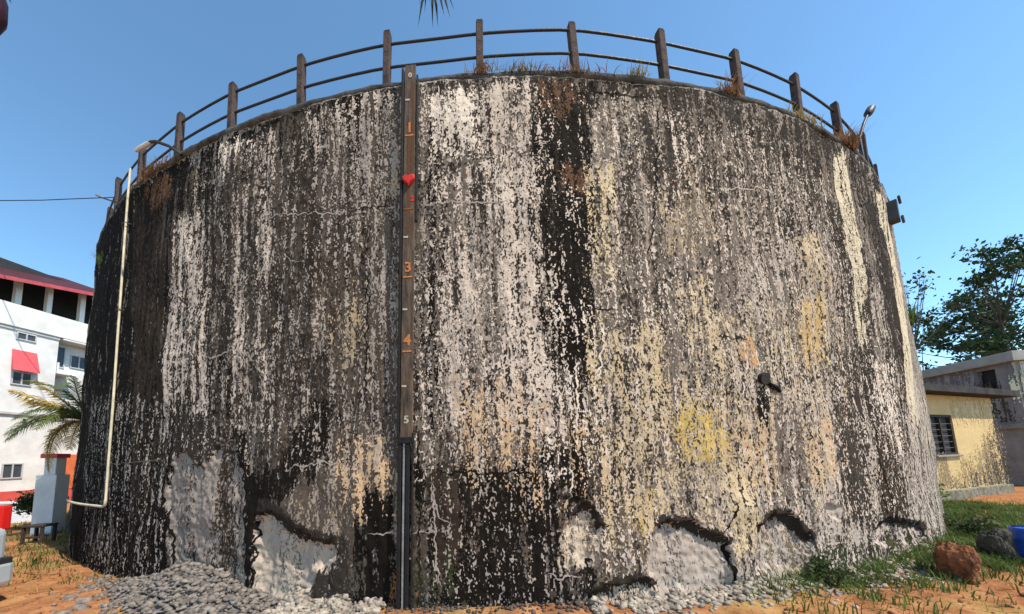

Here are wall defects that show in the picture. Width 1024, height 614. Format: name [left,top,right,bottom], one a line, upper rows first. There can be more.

leakage [69,76,946,609]
peeling [82,76,944,608]
crack [720,497,740,582]